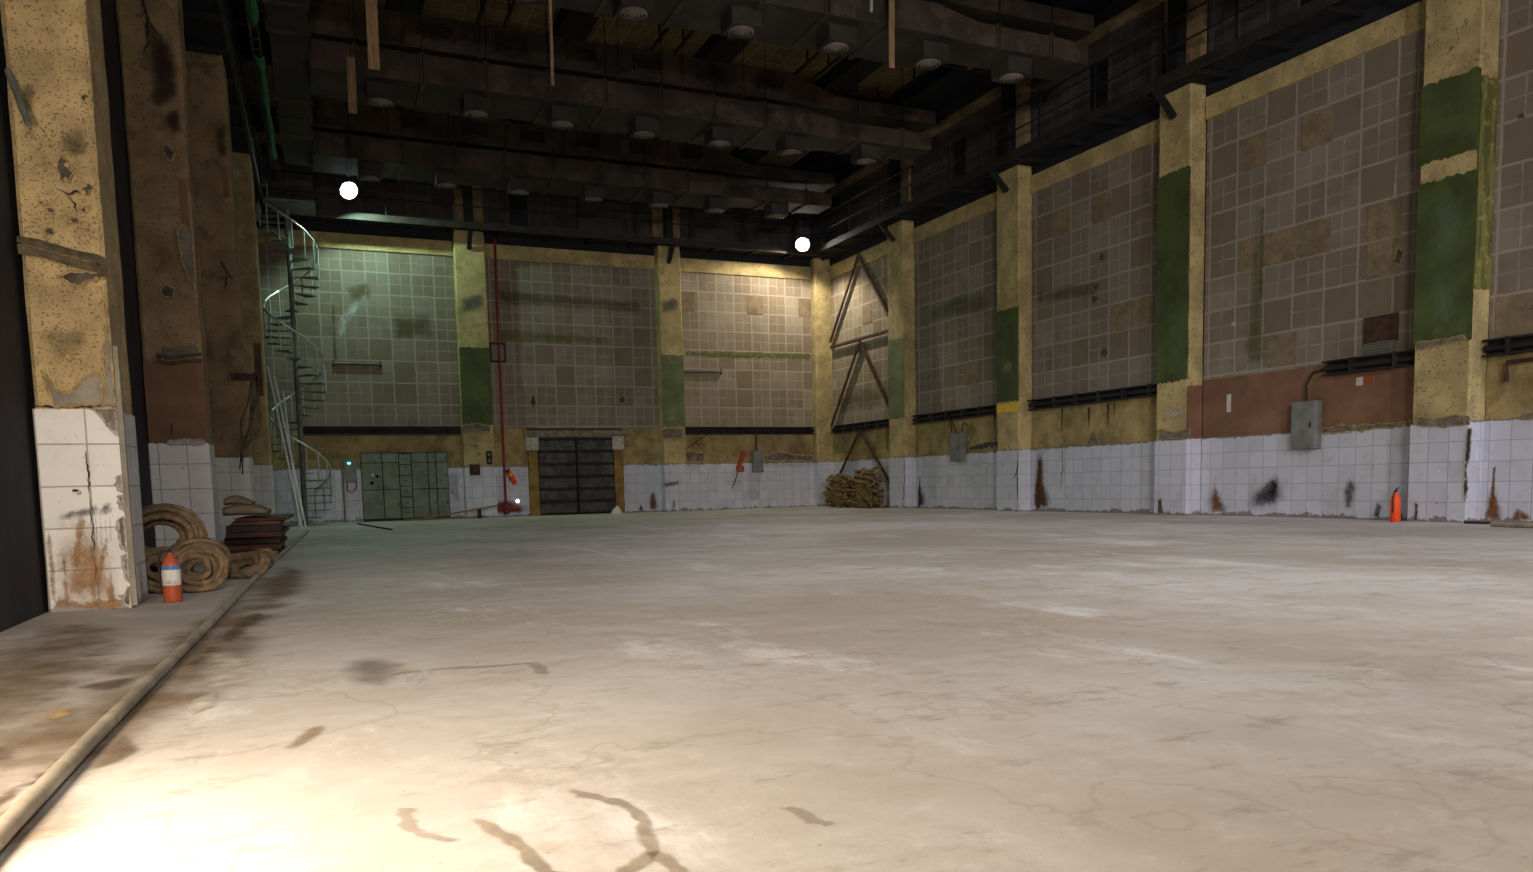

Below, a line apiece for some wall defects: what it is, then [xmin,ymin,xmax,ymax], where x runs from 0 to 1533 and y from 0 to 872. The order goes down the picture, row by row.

rust [1035,460,1047,509]
rust [1486,467,1528,519]
rust [48,521,117,607]